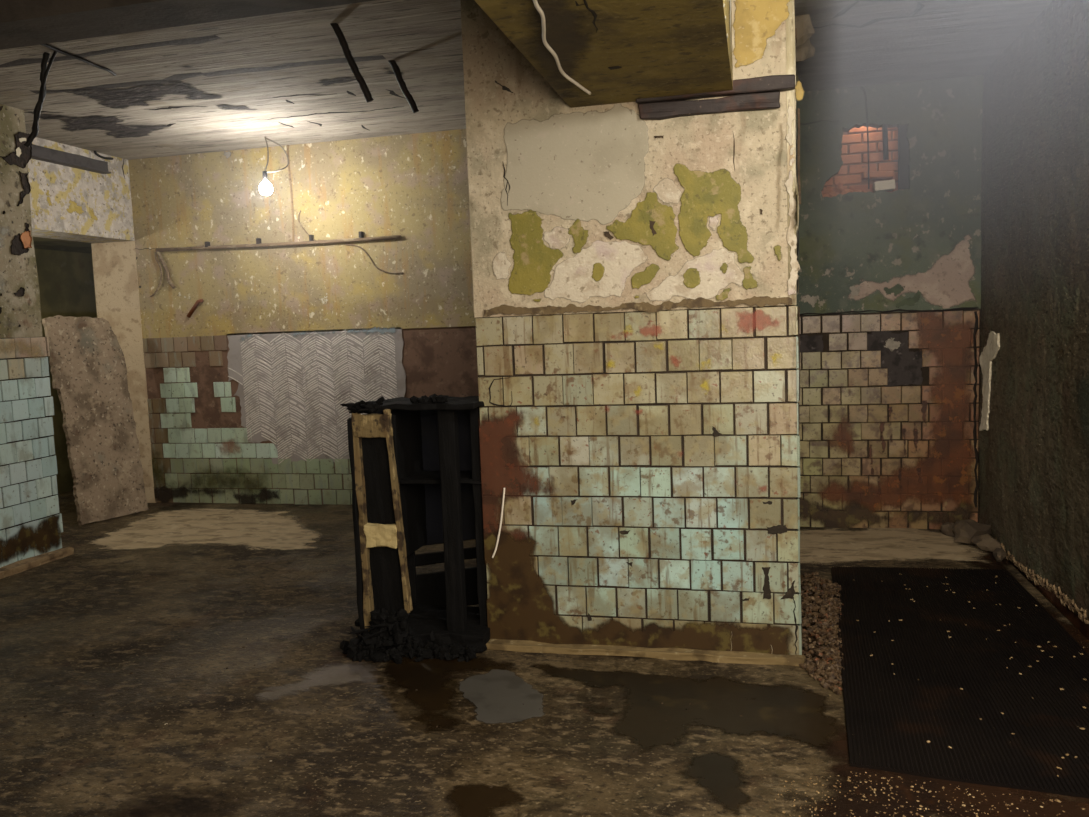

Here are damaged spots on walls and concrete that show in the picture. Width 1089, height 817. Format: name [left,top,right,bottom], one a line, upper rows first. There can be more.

peeling [723,0,790,68]
spalling [0,132,54,255]
peeling [484,76,819,316]
flaking render [848,235,975,309]
peeling [798,334,824,355]
peeling [864,327,923,387]
corrosion [820,312,976,514]
corrosion [479,410,554,540]
damp [0,515,61,564]
damp [91,508,319,550]
damp [799,498,1011,570]
damp [484,531,802,655]